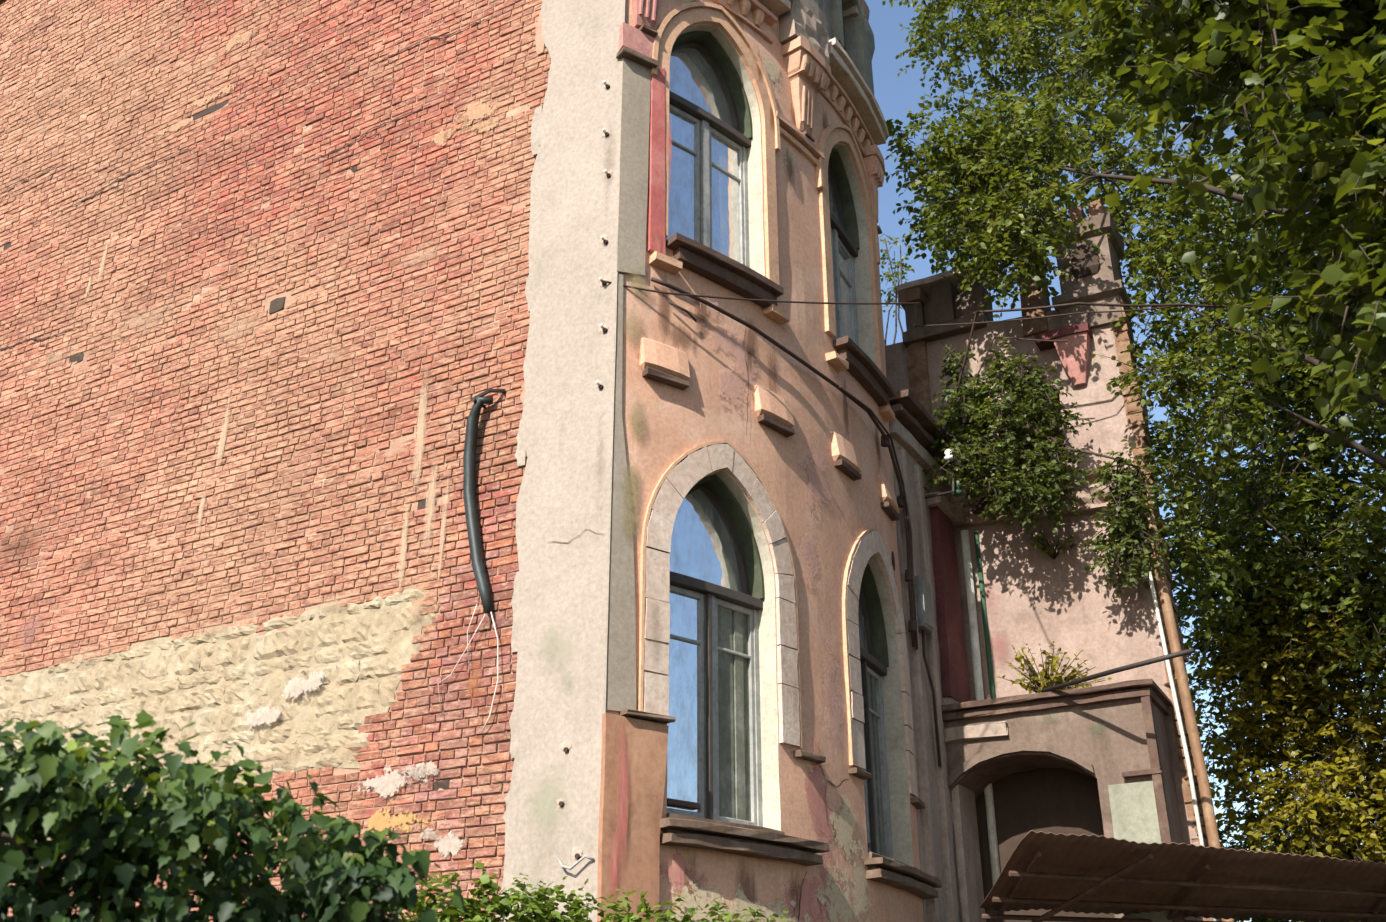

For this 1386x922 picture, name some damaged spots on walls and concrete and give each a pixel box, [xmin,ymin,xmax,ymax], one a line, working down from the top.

damp [630,275,706,346]
damp [747,323,776,391]
spalling [433,779,453,791]
peeling [367,808,429,833]
spalling [660,738,872,922]